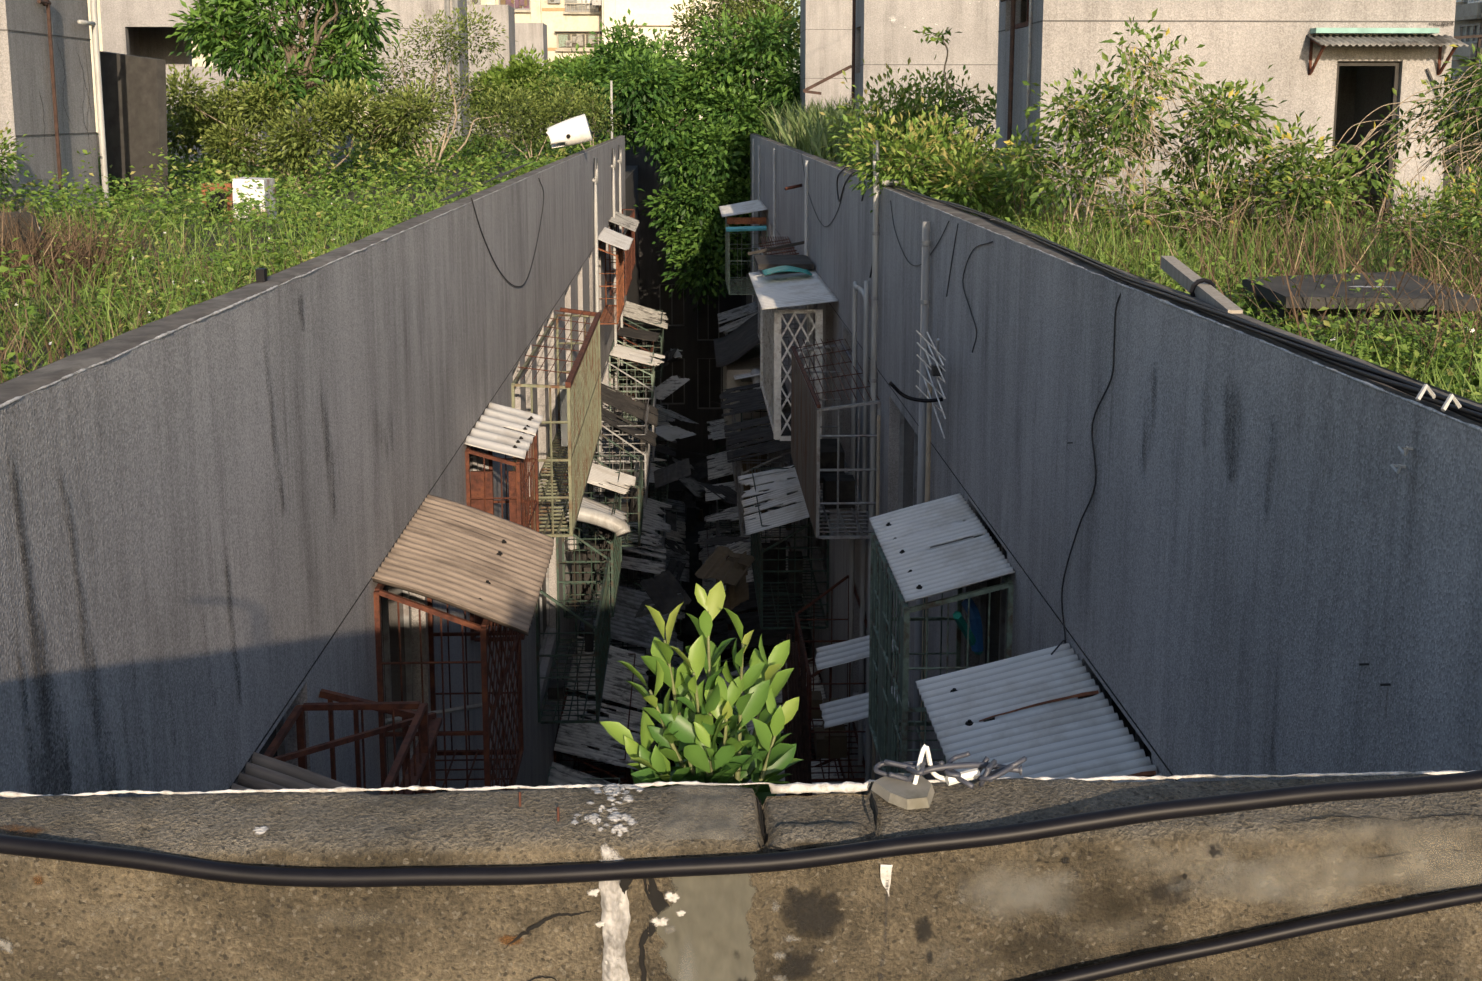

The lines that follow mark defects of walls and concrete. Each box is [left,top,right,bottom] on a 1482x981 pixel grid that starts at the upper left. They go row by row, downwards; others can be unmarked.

damp [13,463,72,797]
efflorescence [571,784,643,862]
efflorescence [588,880,631,981]
efflorescence [651,892,686,927]